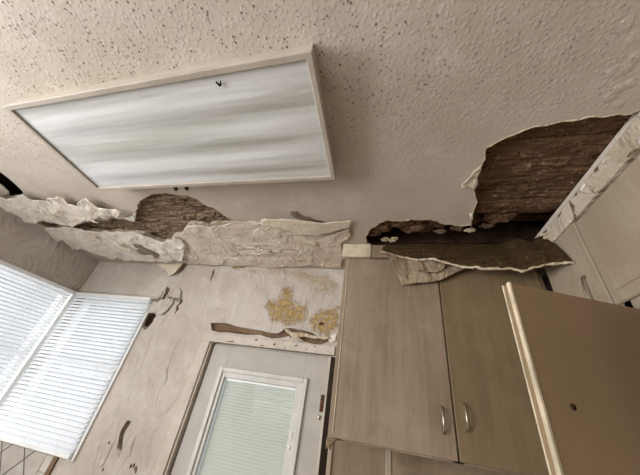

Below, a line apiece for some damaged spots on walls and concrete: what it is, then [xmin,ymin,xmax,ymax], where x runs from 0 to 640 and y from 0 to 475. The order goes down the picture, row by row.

peeling [461,165,481,191]
peeling [0,195,352,276]
damp [266,288,341,335]
flaking render [212,324,337,350]